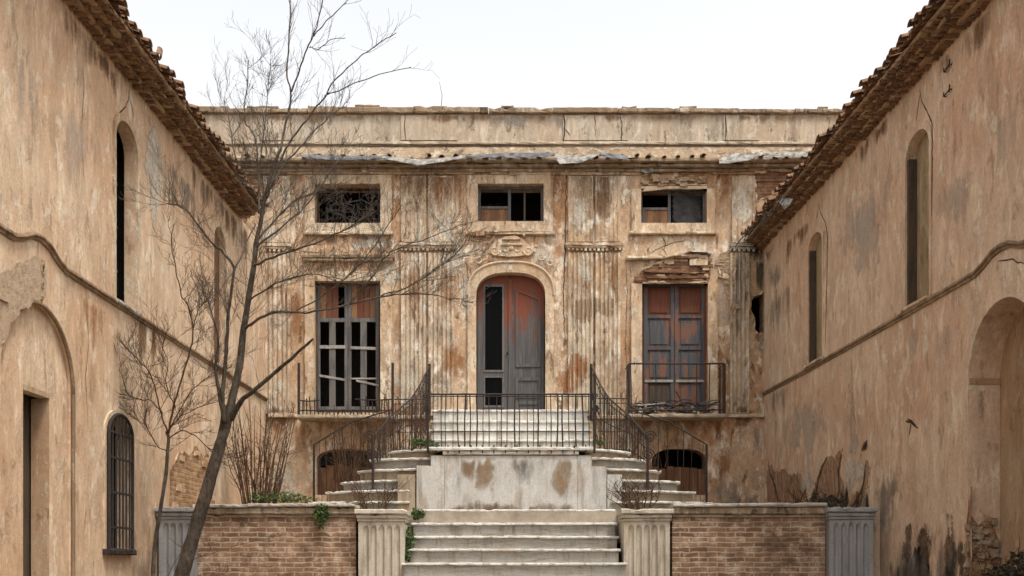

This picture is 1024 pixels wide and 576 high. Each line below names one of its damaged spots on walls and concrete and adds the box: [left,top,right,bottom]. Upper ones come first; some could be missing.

flaking render [0,256,47,345]
flaking render [633,248,763,334]
flaking render [170,446,210,508]
flaking render [766,449,871,508]
spalling [902,486,1003,576]